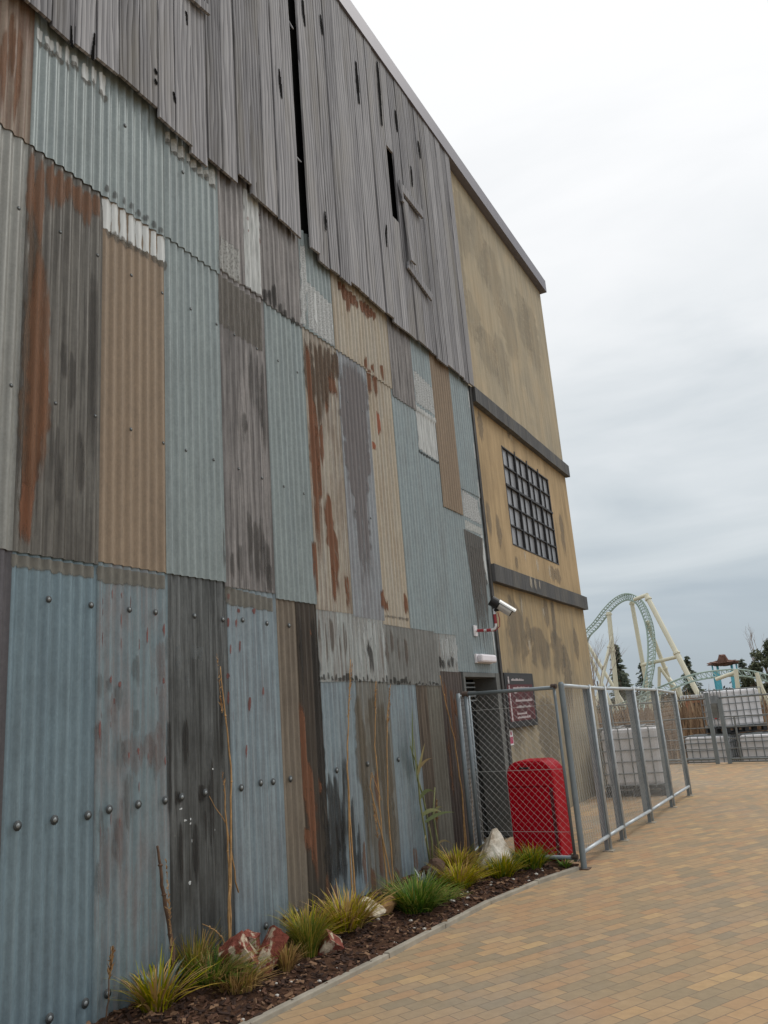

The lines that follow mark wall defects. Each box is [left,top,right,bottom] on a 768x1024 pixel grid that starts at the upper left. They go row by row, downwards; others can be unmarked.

rust [0,14,22,111]
rust [18,154,100,540]
rust [304,334,350,604]
rust [337,281,376,320]
rust [364,357,384,395]
rust [299,708,338,902]